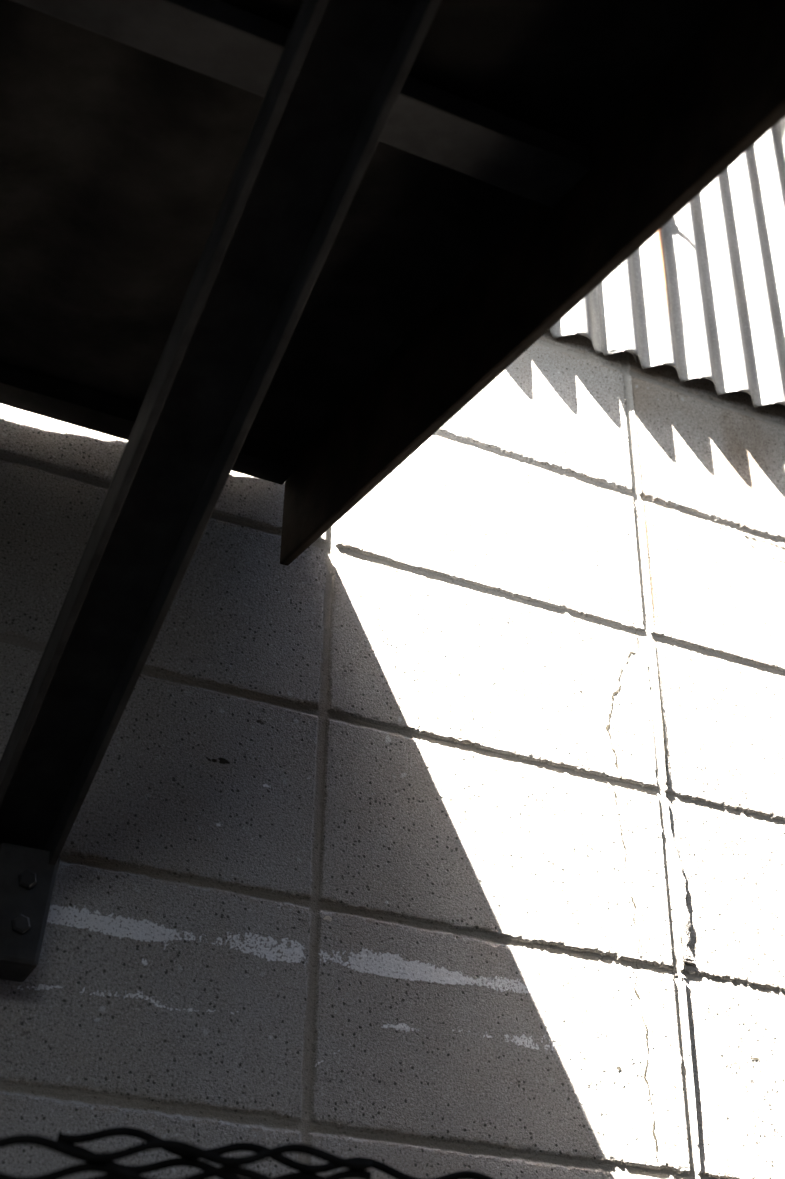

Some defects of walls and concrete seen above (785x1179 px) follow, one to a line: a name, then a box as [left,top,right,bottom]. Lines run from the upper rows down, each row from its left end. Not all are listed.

rust [657,229,668,290]
crack [605,385,668,1162]